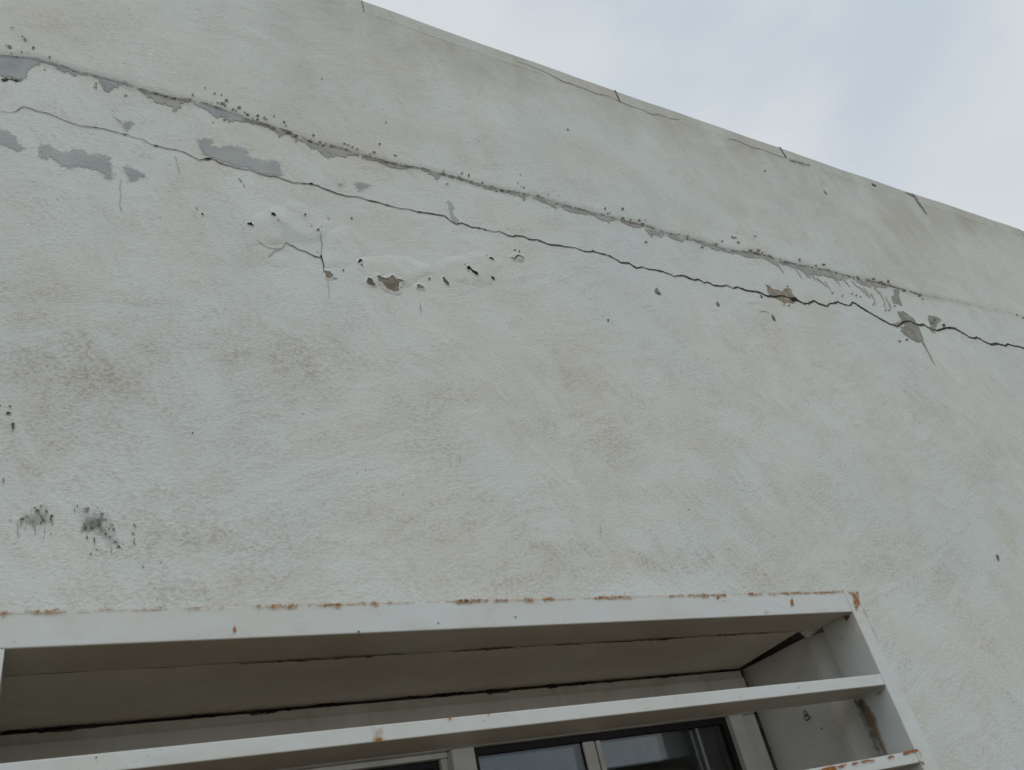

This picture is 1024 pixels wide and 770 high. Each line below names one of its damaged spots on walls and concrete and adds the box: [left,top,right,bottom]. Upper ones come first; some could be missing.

peeling [0,27,941,364]
crack [4,106,1024,349]
leakage [10,505,53,539]
leakage [74,505,121,555]
corrosion [821,702,924,770]